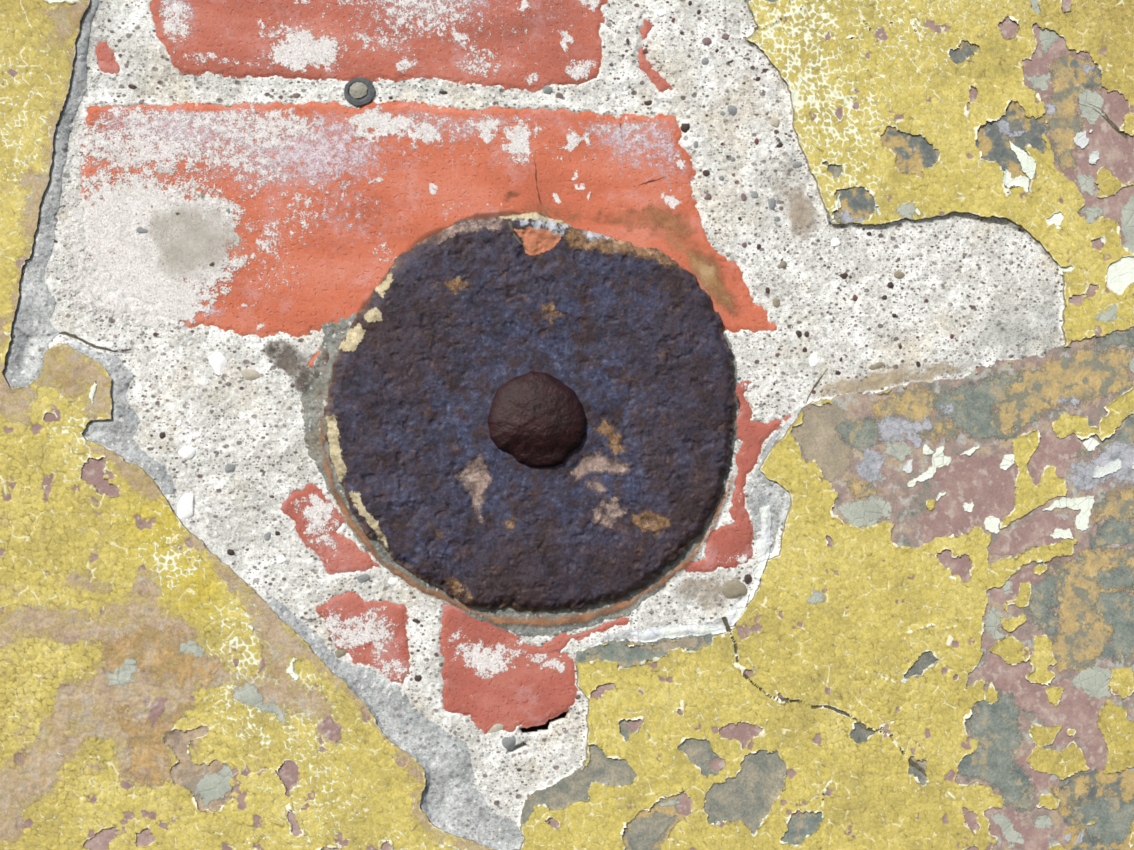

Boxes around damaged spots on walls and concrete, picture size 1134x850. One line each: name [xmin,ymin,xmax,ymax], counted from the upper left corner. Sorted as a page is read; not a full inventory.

corrosion [411,212,520,249]
corrosion [646,206,691,238]
corrosion [688,252,735,313]
peeling [826,186,877,225]
peeling [972,23,1134,294]
corrosion [324,457,733,625]
flaking render [691,439,743,562]
peeling [790,326,1134,850]
peeling [0,566,239,842]
crack [722,616,926,776]
peeling [520,743,637,826]
peeling [619,722,788,850]